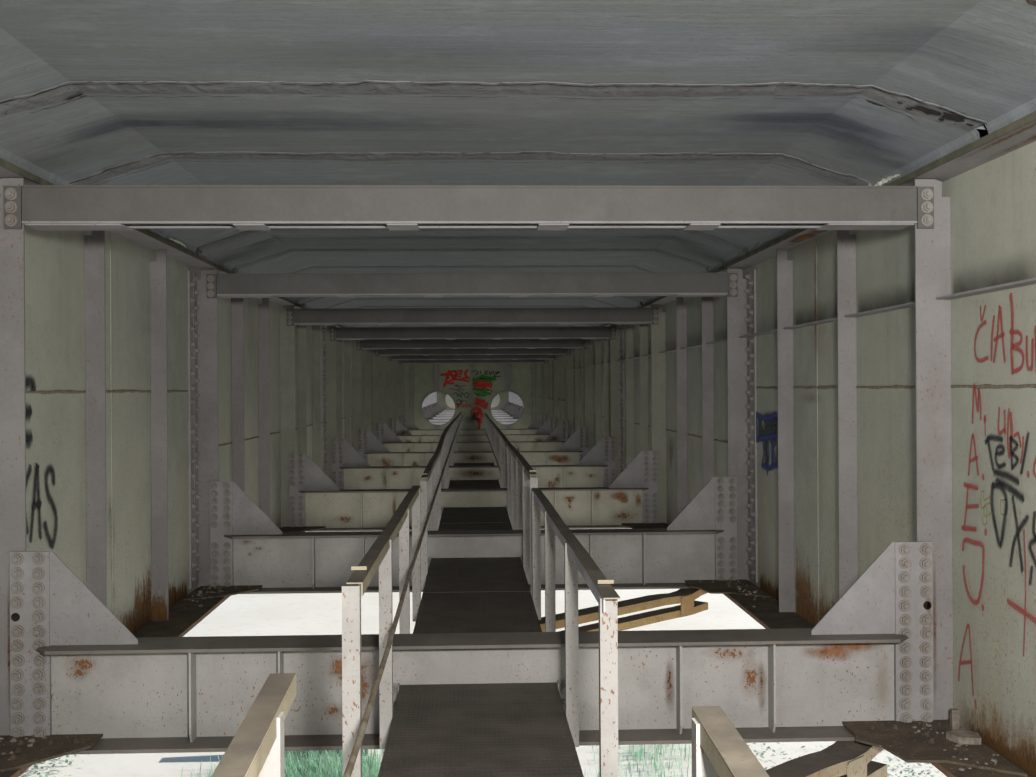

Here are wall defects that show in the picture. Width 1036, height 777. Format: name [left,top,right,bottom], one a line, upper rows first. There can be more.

spalling [856,97,974,126]
corrosion [122,572,187,634]
corrosion [796,569,834,626]
corrosion [820,643,868,656]
corrosion [966,710,1036,777]